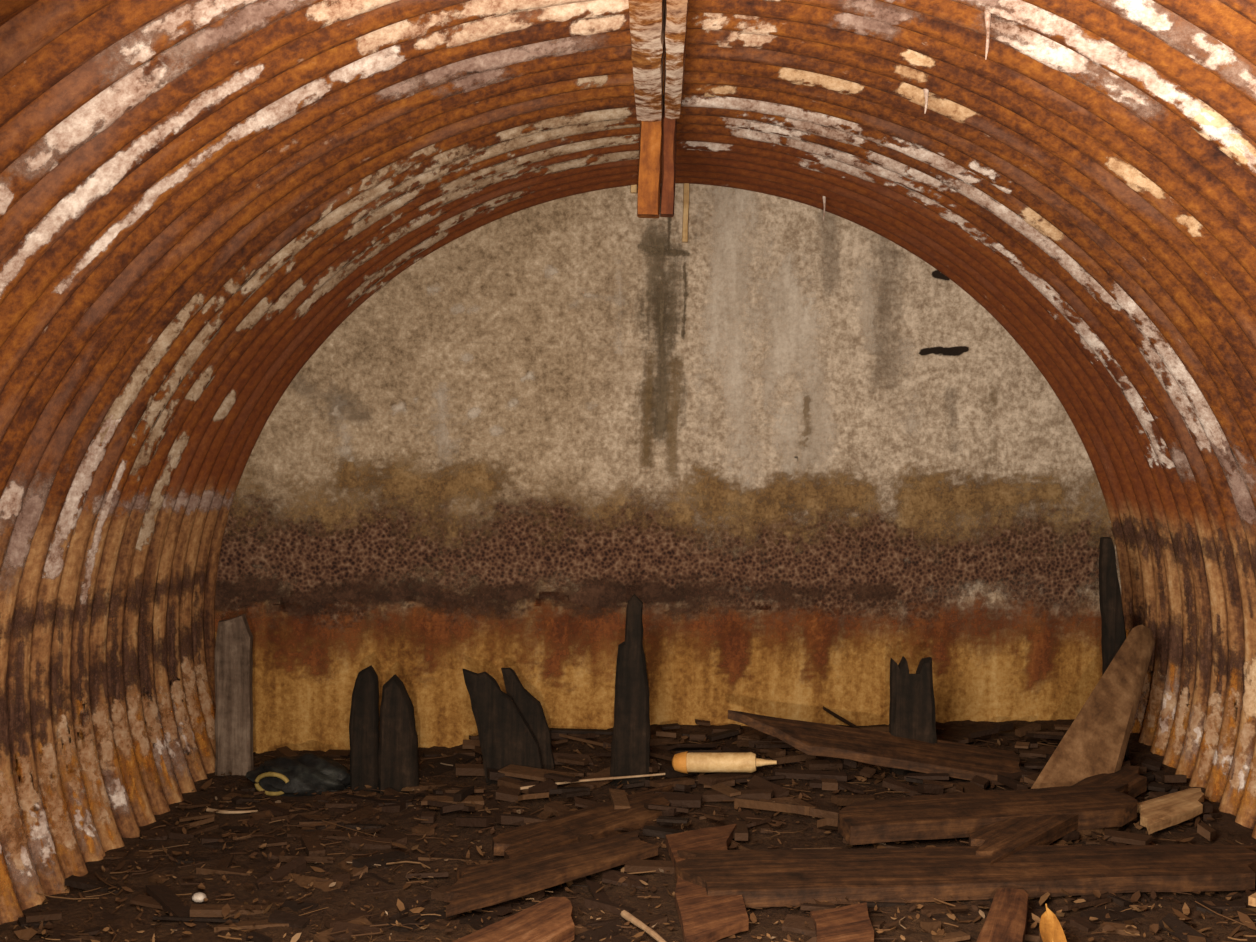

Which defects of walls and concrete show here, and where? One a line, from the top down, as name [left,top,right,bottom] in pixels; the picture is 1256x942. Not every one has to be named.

peeling [0,0,400,214]
leakage [54,45,406,294]
peeling [356,0,629,98]
leakage [895,49,977,123]
peeling [963,0,1160,117]
peeling [1105,0,1256,98]
leakage [0,64,1256,763]
rust [215,589,626,687]
rust [642,592,1102,690]
peeling [0,657,215,885]
rust [0,689,215,906]
rust [1131,673,1254,813]